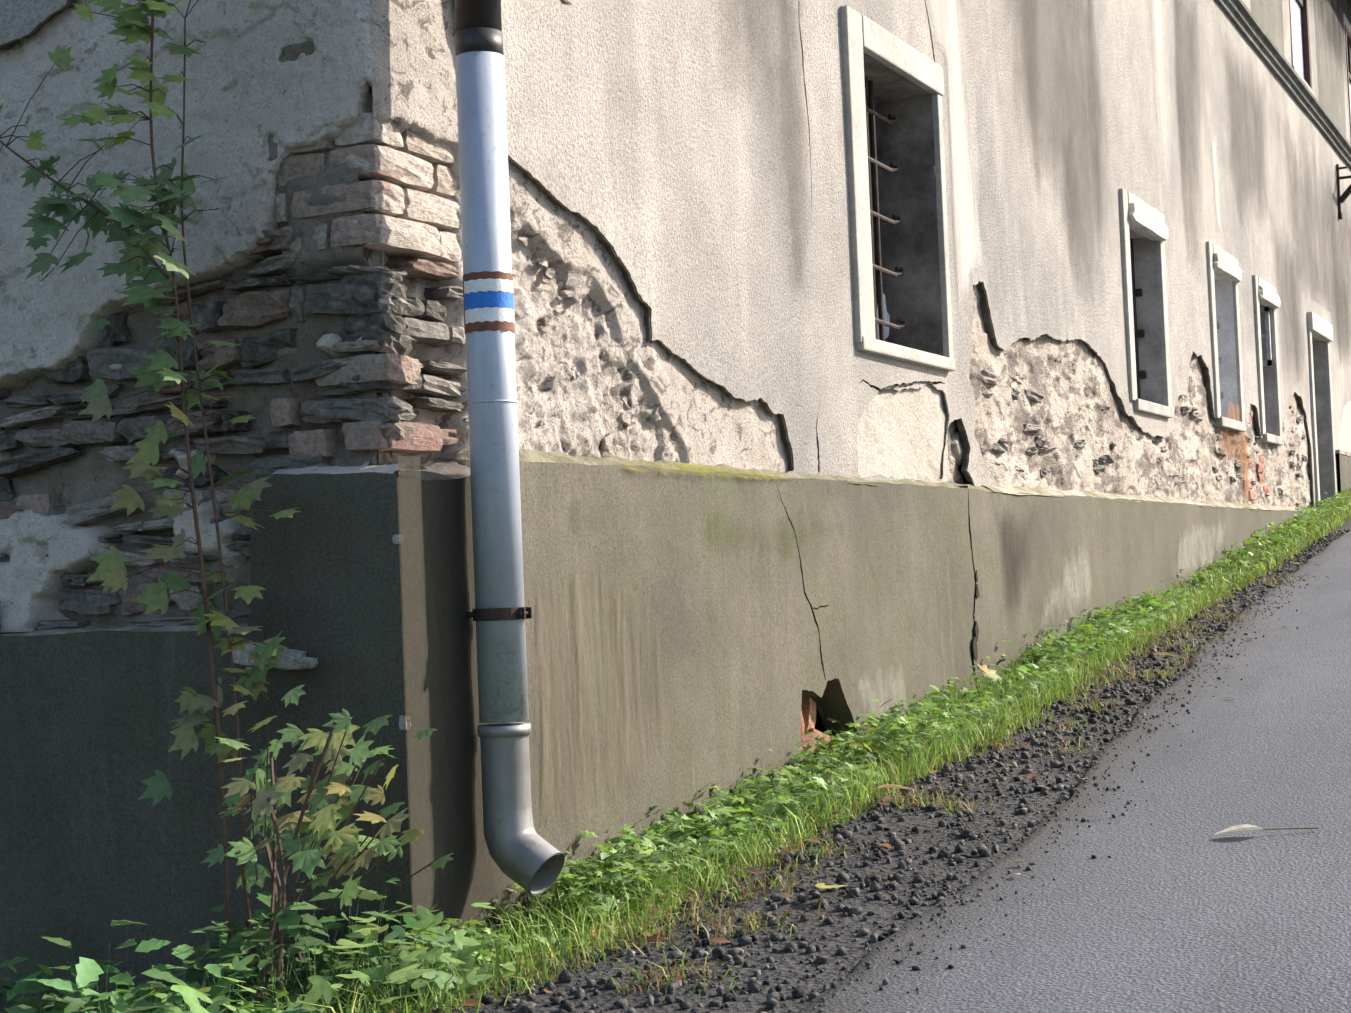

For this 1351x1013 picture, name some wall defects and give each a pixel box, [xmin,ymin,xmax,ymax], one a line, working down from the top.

water stain [932,0,977,289]
water stain [1019,0,1095,219]
water stain [1153,0,1195,176]
water stain [1230,67,1262,189]
spalling [0,0,469,633]
spalling [508,156,794,473]
spalling [857,282,1314,509]
water stain [1294,175,1351,327]
crack [784,507,828,678]
crack [957,485,980,689]
spalling [797,690,833,767]